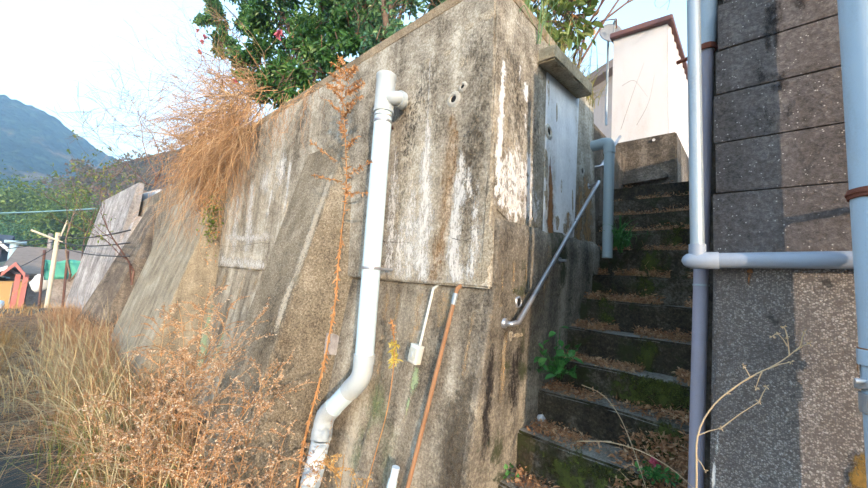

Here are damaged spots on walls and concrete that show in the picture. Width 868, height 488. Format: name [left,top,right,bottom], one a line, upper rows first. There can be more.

leakage [764,3,782,52]
corrosion [431,116,458,278]
leakage [436,340,522,488]